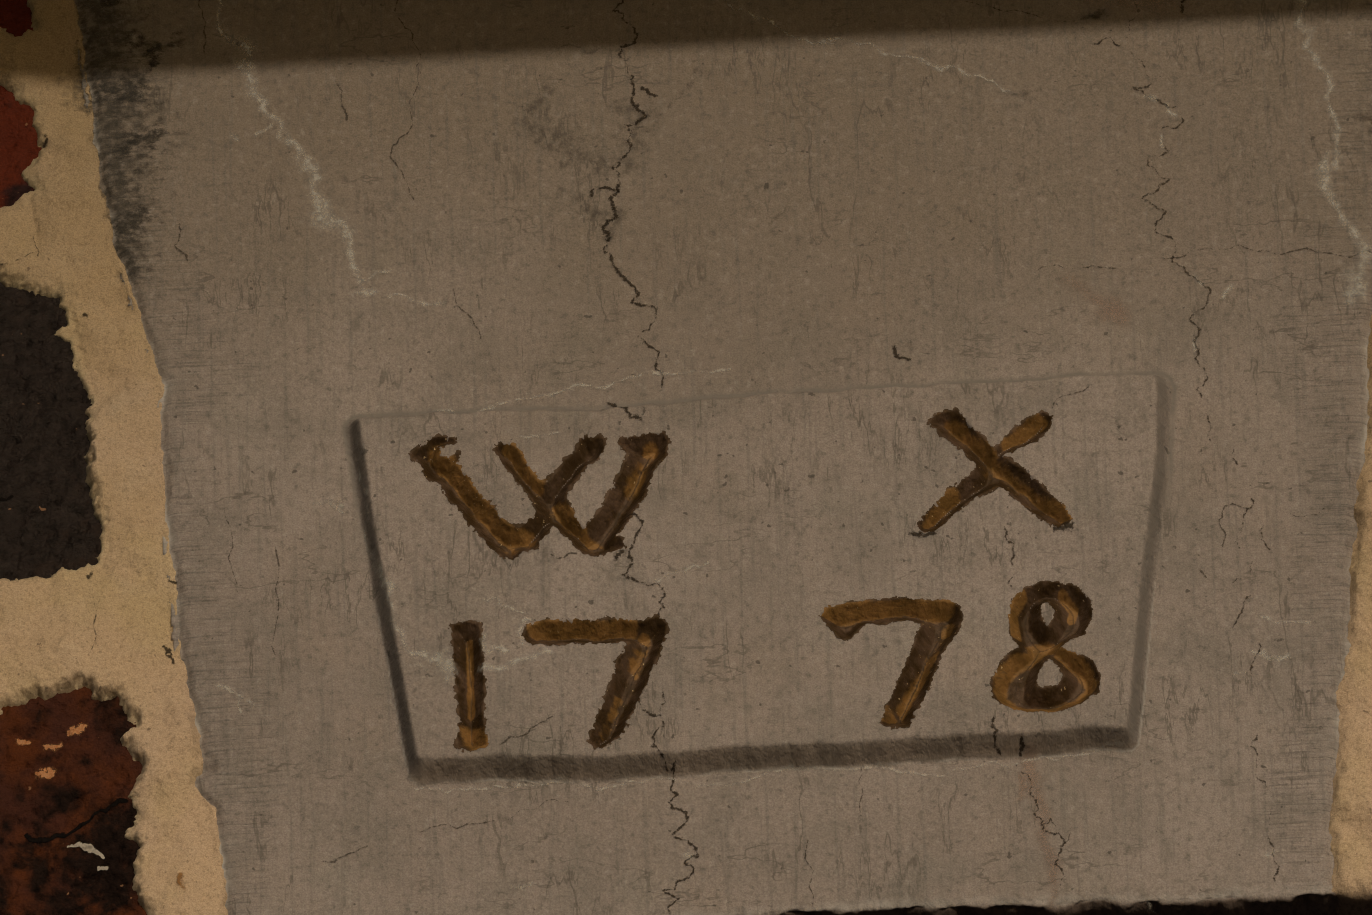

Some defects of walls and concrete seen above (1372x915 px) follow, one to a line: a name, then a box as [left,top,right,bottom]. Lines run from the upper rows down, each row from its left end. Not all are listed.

crack [590,0,664,388]
crack [1094,4,1372,464]
crack [607,402,642,420]
crack [615,513,666,615]
crack [1201,498,1270,674]
crack [639,692,699,911]